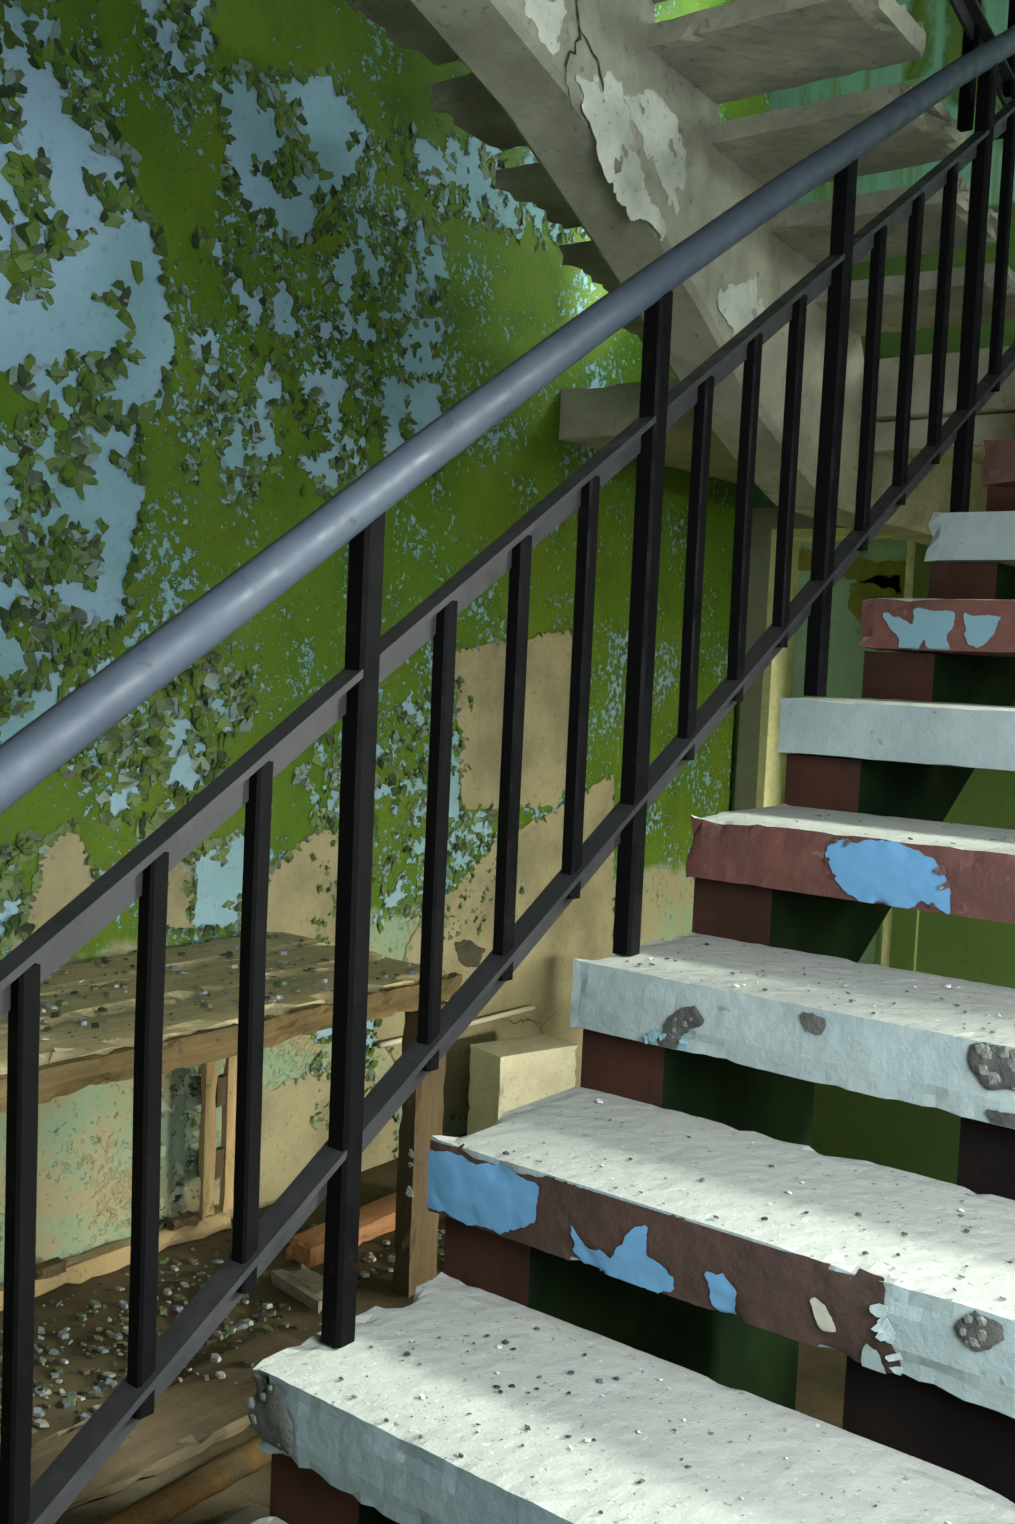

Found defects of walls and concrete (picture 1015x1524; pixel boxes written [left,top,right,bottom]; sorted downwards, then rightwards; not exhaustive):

crack [565,0,604,113]
flaking render [576,71,686,241]
peeling [0,0,586,745]
peeling [840,557,1001,651]
peeling [166,828,244,938]
flaking render [267,733,341,944]
flaking render [442,639,506,1002]
flaking render [443,851,615,1120]
flaking render [515,628,573,923]
peeling [824,839,951,914]
flaking render [259,1028,332,1209]
peeling [361,1111,903,1375]